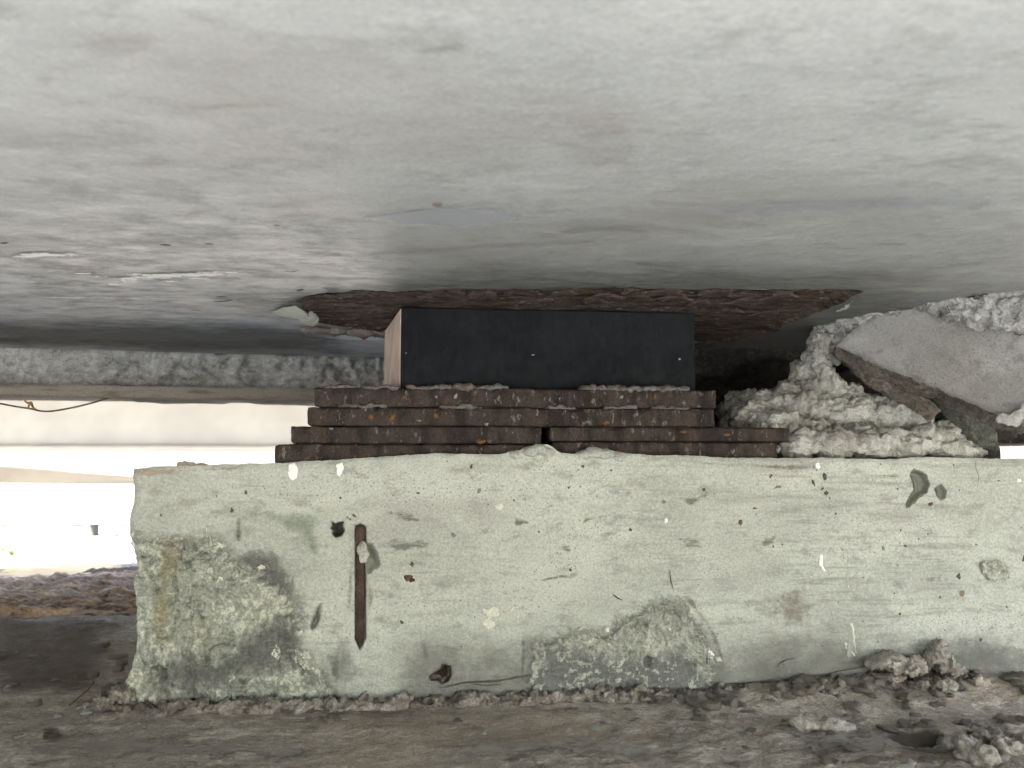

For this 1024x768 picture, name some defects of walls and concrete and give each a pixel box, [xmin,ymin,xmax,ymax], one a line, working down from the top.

peeling [15,252,84,260]
peeling [75,271,238,285]
spalling [244,287,862,345]
spalling [995,402,1024,427]
spalling [906,469,960,508]
rust [355,524,370,650]
spalling [87,527,335,707]
spalling [527,595,722,693]